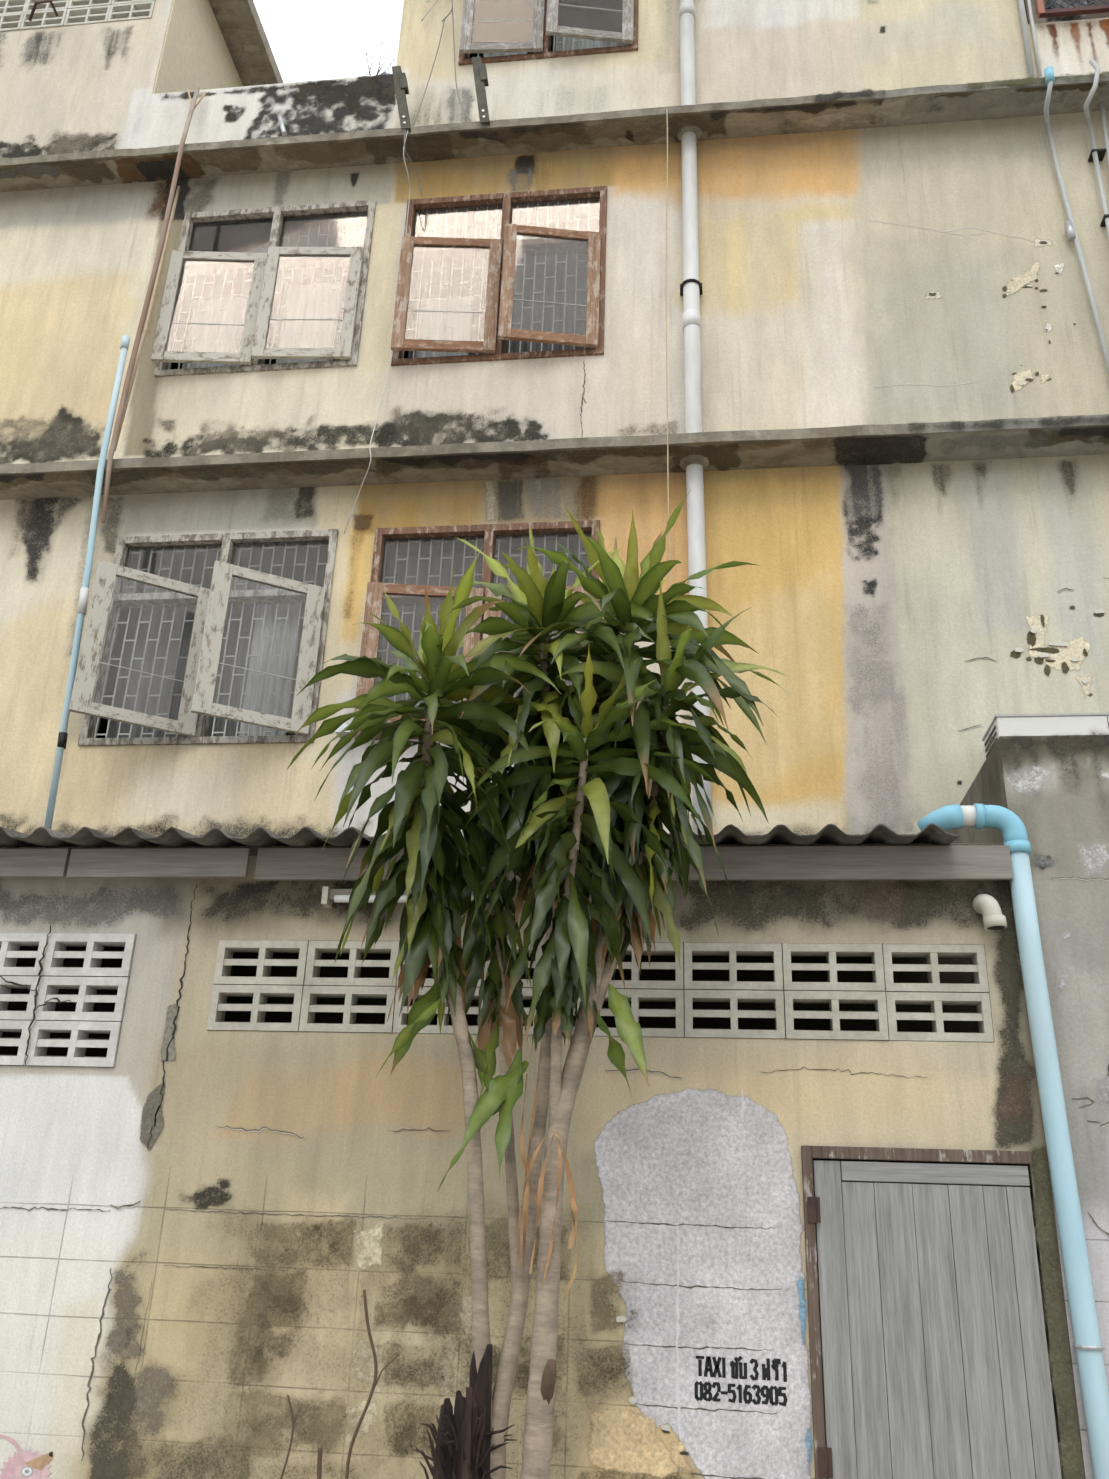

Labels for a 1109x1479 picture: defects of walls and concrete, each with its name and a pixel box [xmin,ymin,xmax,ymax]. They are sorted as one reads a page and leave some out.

rust [1042,19,1109,59]
water stain [0,71,1109,220]
peeling [1002,239,1065,343]
peeling [1010,365,1052,393]
water stain [0,406,1109,580]
peeling [1010,614,1093,698]
crack [140,885,198,1149]
crack [763,1067,927,1078]
crack [81,1268,113,1462]
water stain [88,1179,511,1479]
water stain [552,1271,694,1479]
peeling [588,1397,692,1478]